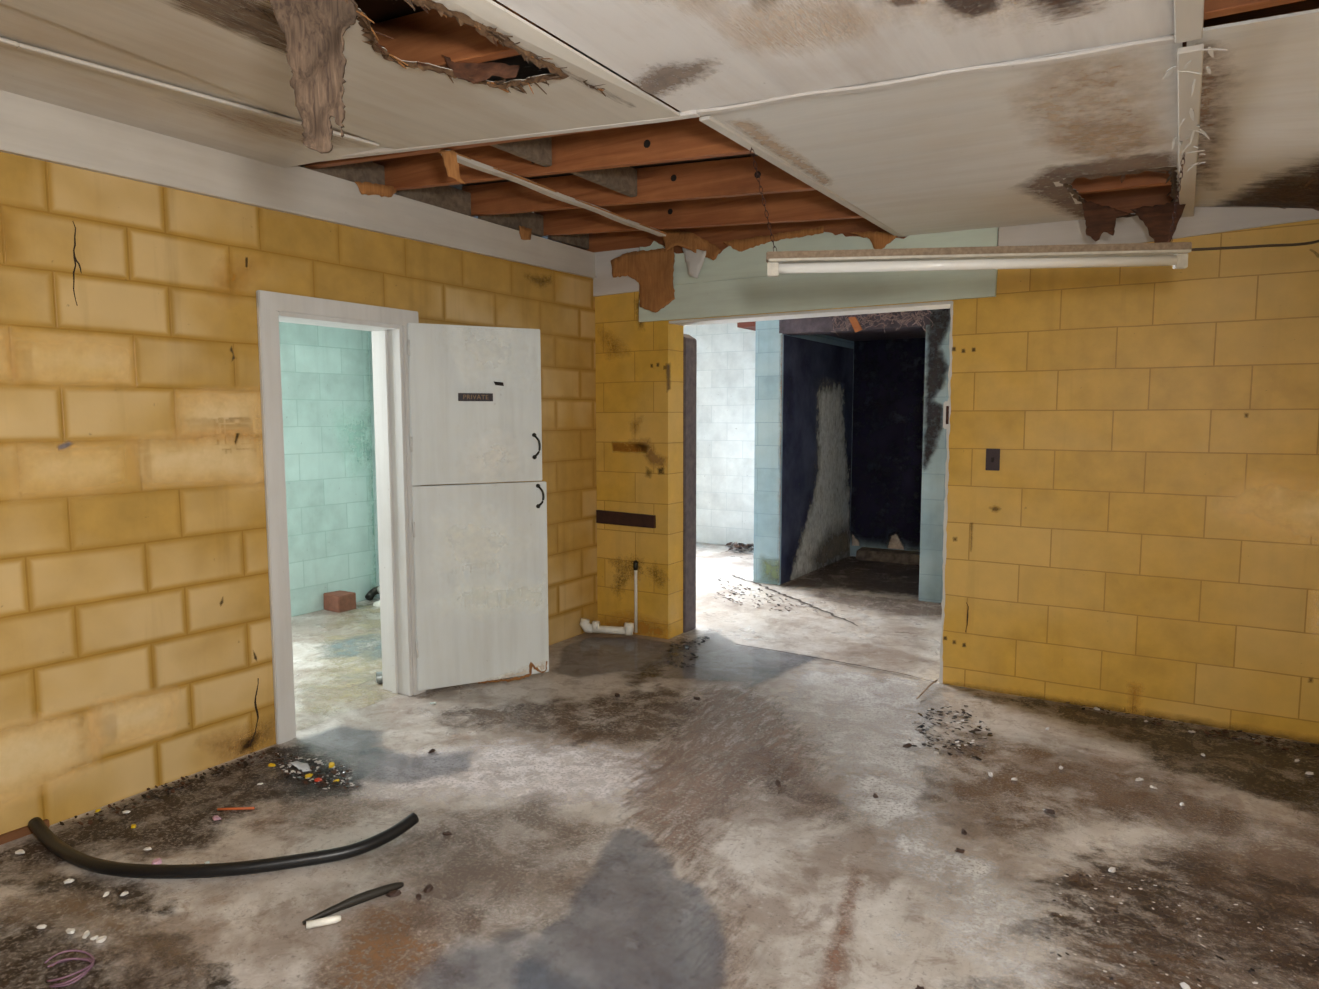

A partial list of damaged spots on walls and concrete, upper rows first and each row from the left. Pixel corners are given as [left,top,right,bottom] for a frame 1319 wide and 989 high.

leakage [943,0,999,17]
leakage [1032,0,1090,20]
peeling [474,24,567,95]
leakage [1223,159,1319,209]
crack [73,222,82,306]